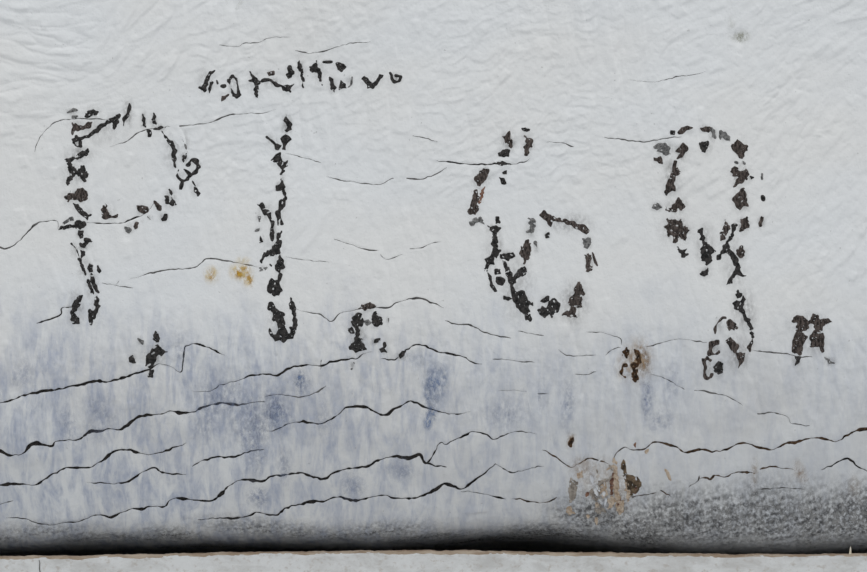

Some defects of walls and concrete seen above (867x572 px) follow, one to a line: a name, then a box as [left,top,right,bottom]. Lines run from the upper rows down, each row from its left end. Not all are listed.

crack [297,297,544,338]
crack [560,332,622,375]
corrosion [619,347,648,383]
crack [0,343,867,525]